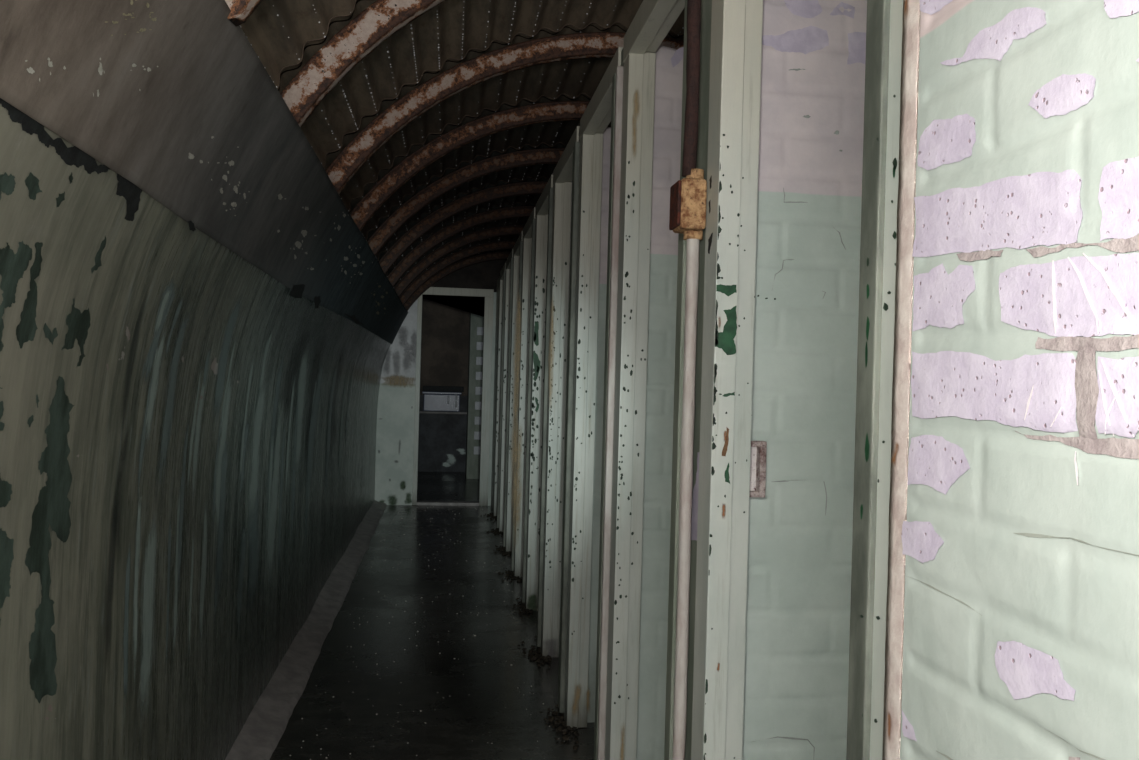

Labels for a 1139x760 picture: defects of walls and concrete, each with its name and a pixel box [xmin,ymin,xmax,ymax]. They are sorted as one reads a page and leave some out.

peeling [941,7,1047,66]
peeling [1028,73,1096,118]
peeling [917,114,976,170]
peeling [0,172,42,200]
peeling [715,164,746,355]
peeling [0,241,91,368]
peeling [691,364,749,556]
peeling [907,435,970,495]
peeling [0,375,74,704]
crack [1015,533,1139,556]
crack [907,576,981,615]
peeling [995,641,1076,701]